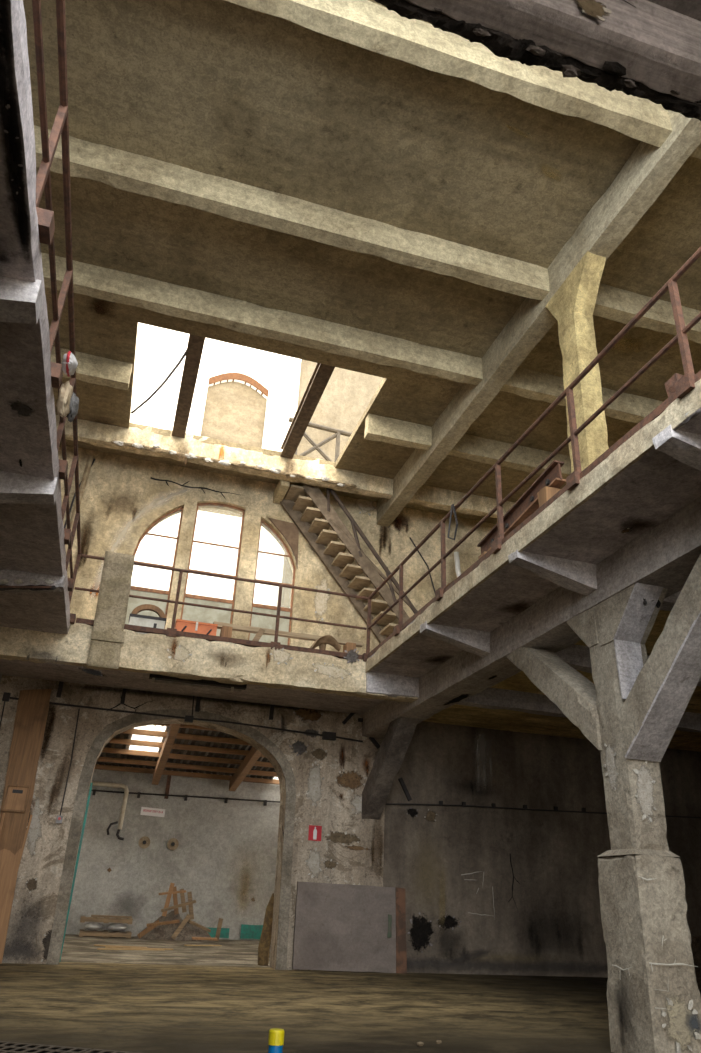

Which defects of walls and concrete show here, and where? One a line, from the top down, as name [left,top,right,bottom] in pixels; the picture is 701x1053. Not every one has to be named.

spalling [374,0,701,121]
leakage [0,0,30,256]
spalling [407,912,462,953]
flaking render [662,993,701,1053]